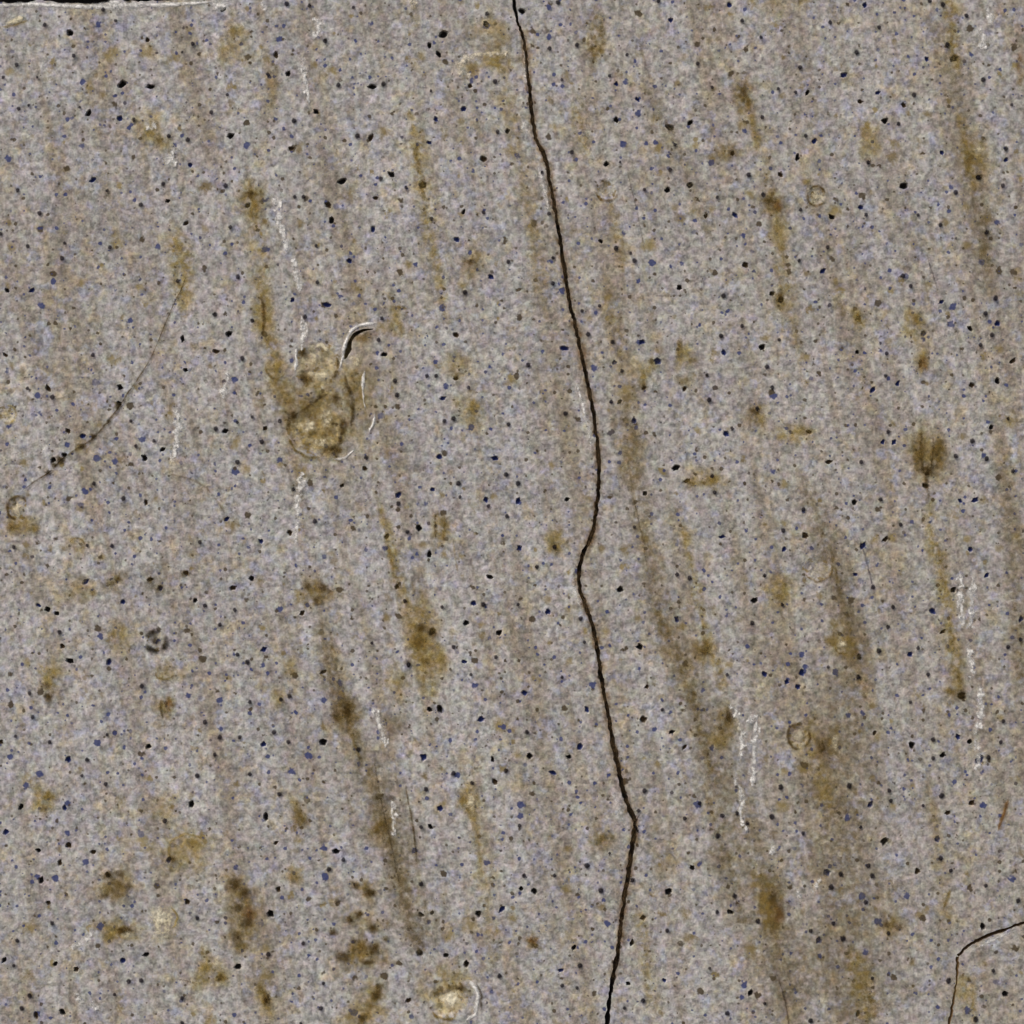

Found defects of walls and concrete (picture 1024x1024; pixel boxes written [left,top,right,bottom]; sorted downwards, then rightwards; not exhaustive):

spalling [285,322,375,461]
crack [512,0,638,1024]
crack [948,921,1024,1024]